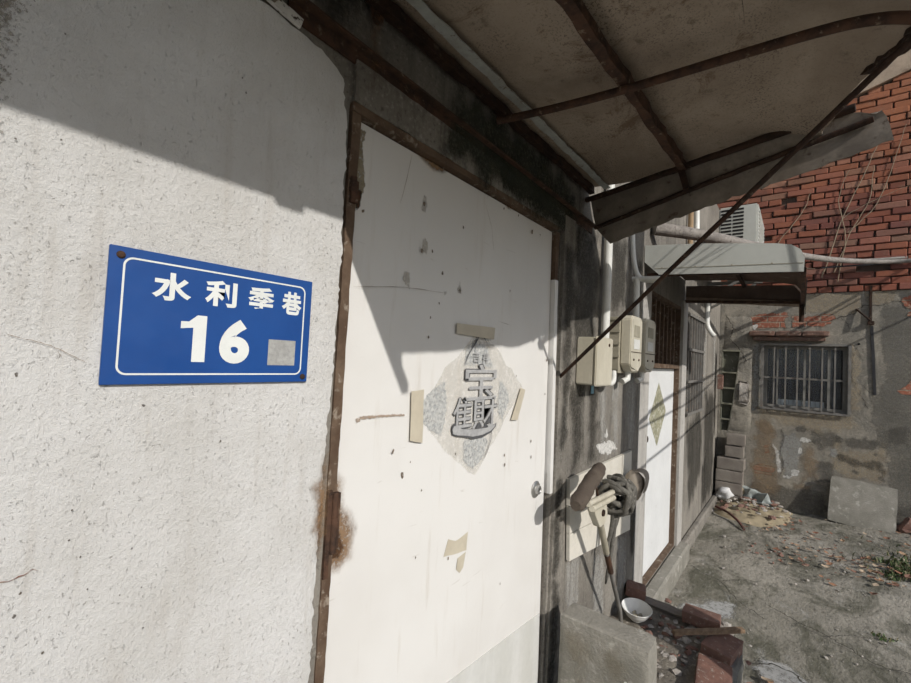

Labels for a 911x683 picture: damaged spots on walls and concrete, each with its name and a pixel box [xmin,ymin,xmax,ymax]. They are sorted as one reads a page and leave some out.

water stain [448,89,576,229]
water stain [561,229,635,470]
peeling [751,291,911,330]
spalling [751,344,861,493]
rust [315,467,326,538]
rust [332,510,352,567]
water stain [548,479,578,683]
water stain [593,557,604,613]
water stain [617,508,635,587]